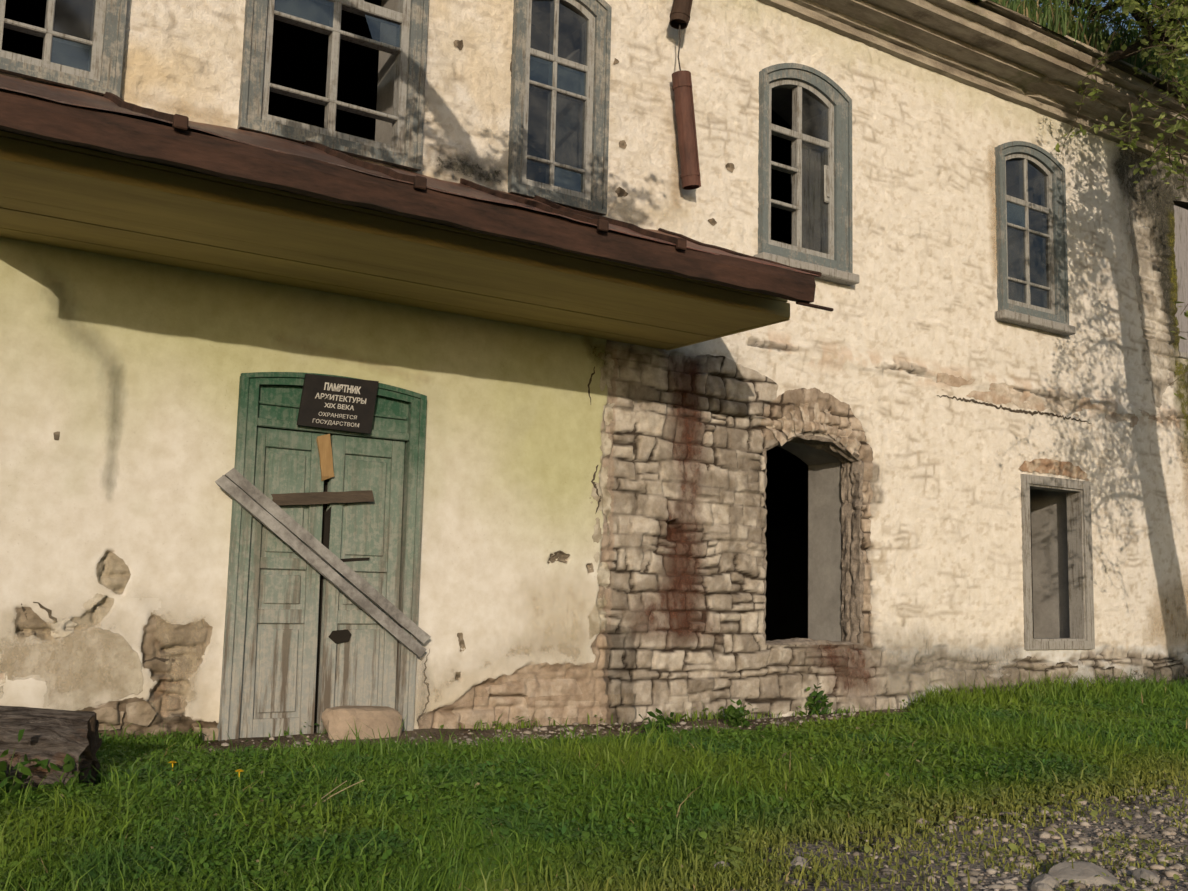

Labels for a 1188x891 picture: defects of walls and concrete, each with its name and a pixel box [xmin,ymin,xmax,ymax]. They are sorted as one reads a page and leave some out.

damp [1115,147,1188,348]
spalling [417,353,635,729]
corrosion [644,359,712,636]
crack [937,395,1092,424]
flaking render [0,550,218,741]